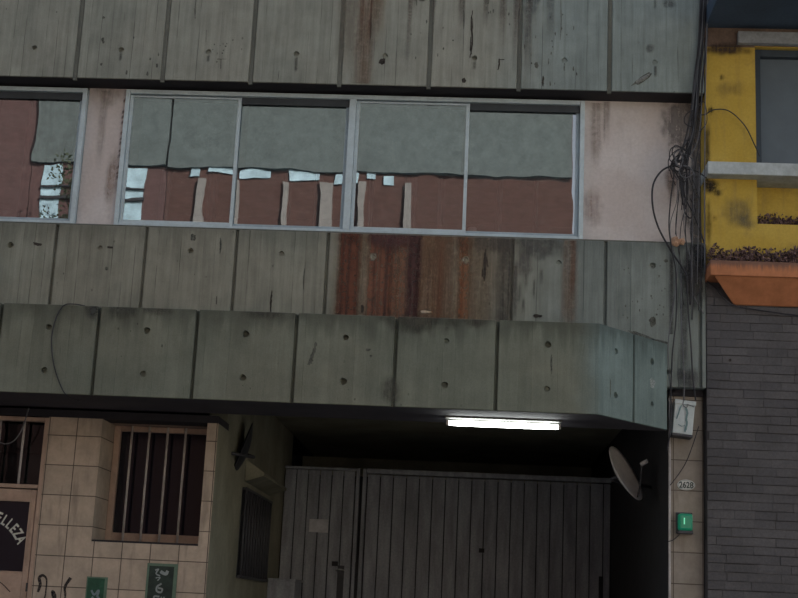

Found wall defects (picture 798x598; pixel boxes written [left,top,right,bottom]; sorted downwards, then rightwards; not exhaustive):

corrosion [336,233,509,319]